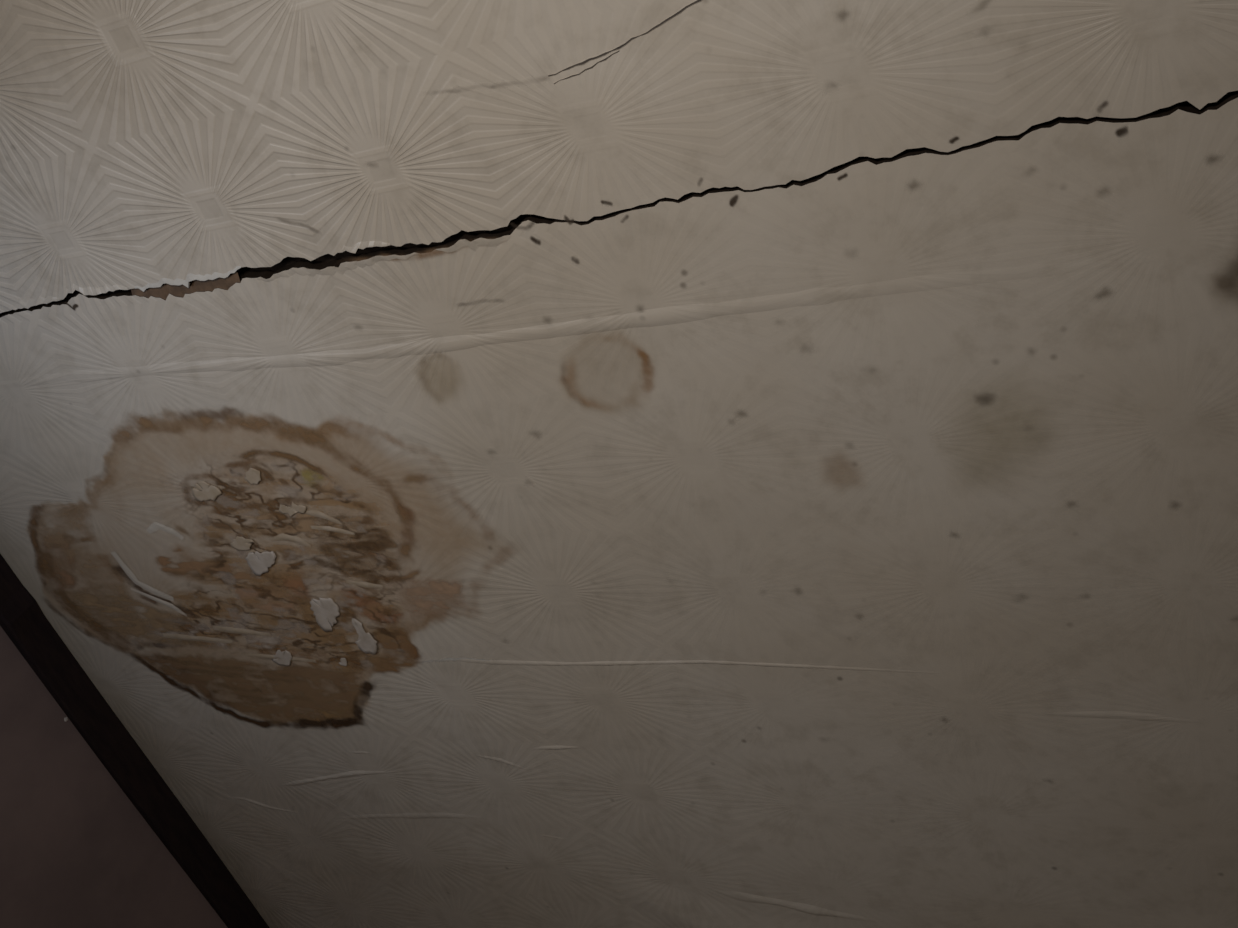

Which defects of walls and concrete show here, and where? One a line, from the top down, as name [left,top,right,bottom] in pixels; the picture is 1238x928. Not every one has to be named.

crack [548,0,703,84]
crack [0,90,1238,318]
leakage [29,408,461,729]